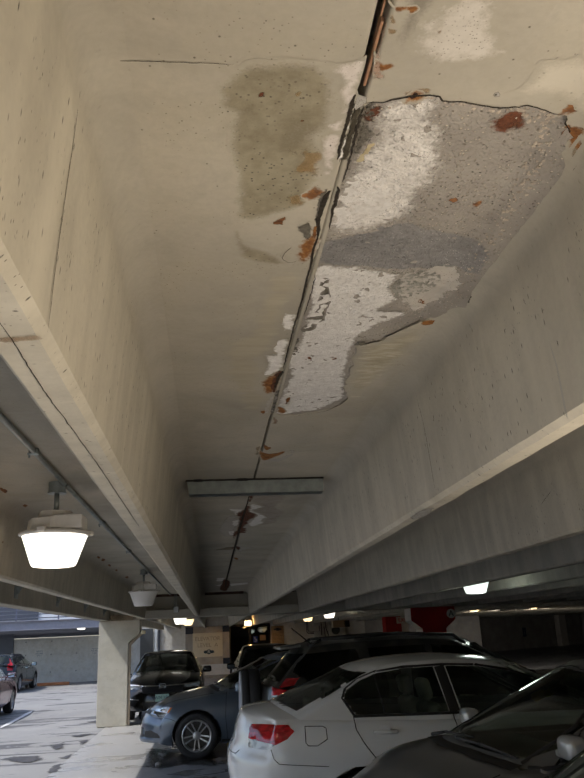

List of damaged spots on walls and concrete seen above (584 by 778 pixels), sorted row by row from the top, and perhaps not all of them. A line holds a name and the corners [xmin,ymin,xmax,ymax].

rust [373,51,395,78]
leakage [393,0,511,67]
rust [488,109,530,134]
rust [554,104,584,151]
crack [274,187,340,390]
leakage [214,55,495,415]
spalling [280,97,573,415]
crack [225,497,249,589]